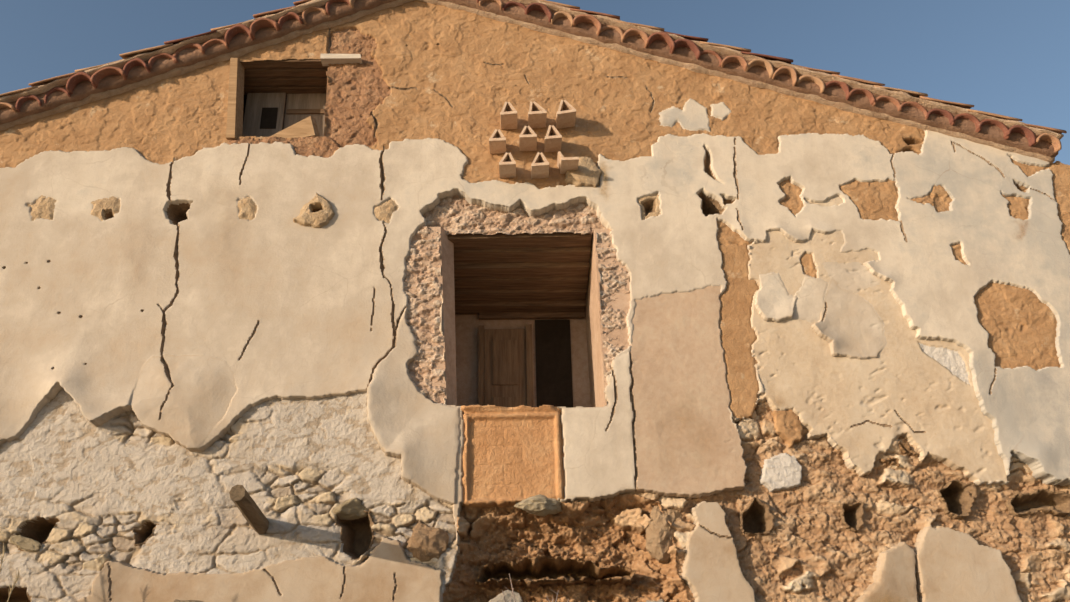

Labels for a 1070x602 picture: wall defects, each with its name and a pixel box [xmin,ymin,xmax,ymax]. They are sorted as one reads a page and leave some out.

spalling [778,179,898,221]
spalling [911,185,952,212]
spalling [1001,157,1070,255]
crack [366,86,454,390]
crack [899,220,908,242]
crack [158,157,180,420]
crack [238,320,259,361]
spalling [0,191,1070,602]
crack [605,352,639,492]
crack [263,568,282,596]
crack [338,567,346,600]
crack [391,574,399,602]